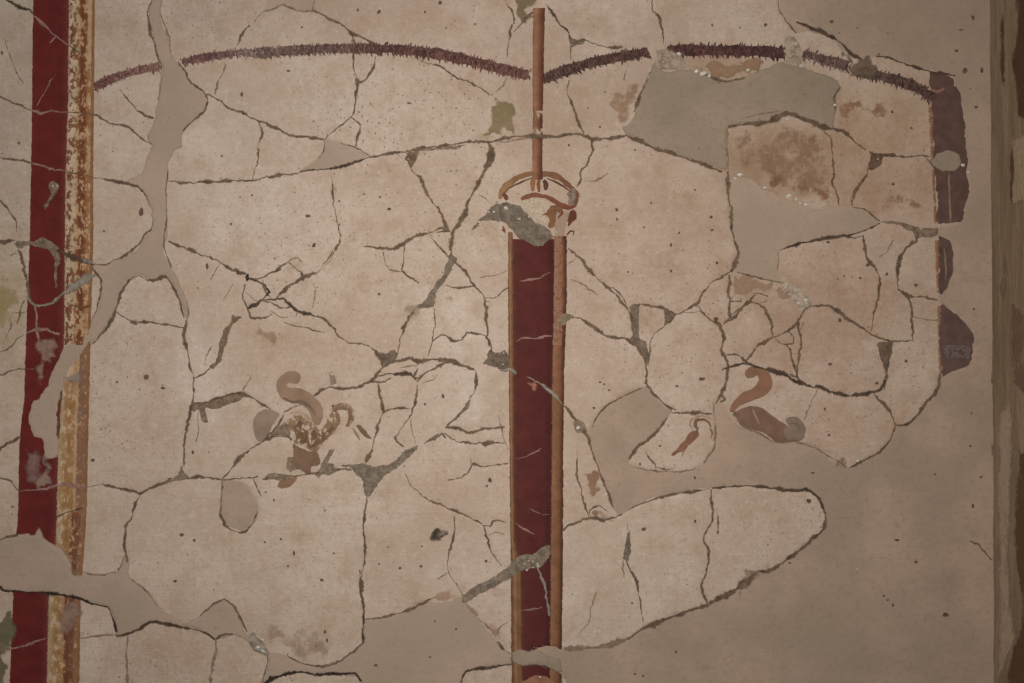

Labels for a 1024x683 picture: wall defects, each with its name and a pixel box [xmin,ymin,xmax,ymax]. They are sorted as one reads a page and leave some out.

peeling [14,0,81,345]
crack [0,157,150,207]
crack [0,200,153,352]
crack [0,76,154,144]
flaking render [472,202,553,246]
crack [89,0,941,651]
peeling [48,595,65,683]
peeling [56,380,76,557]
crack [0,477,247,683]
crack [262,474,548,683]
flaking render [462,545,551,603]
flaking render [623,527,646,561]